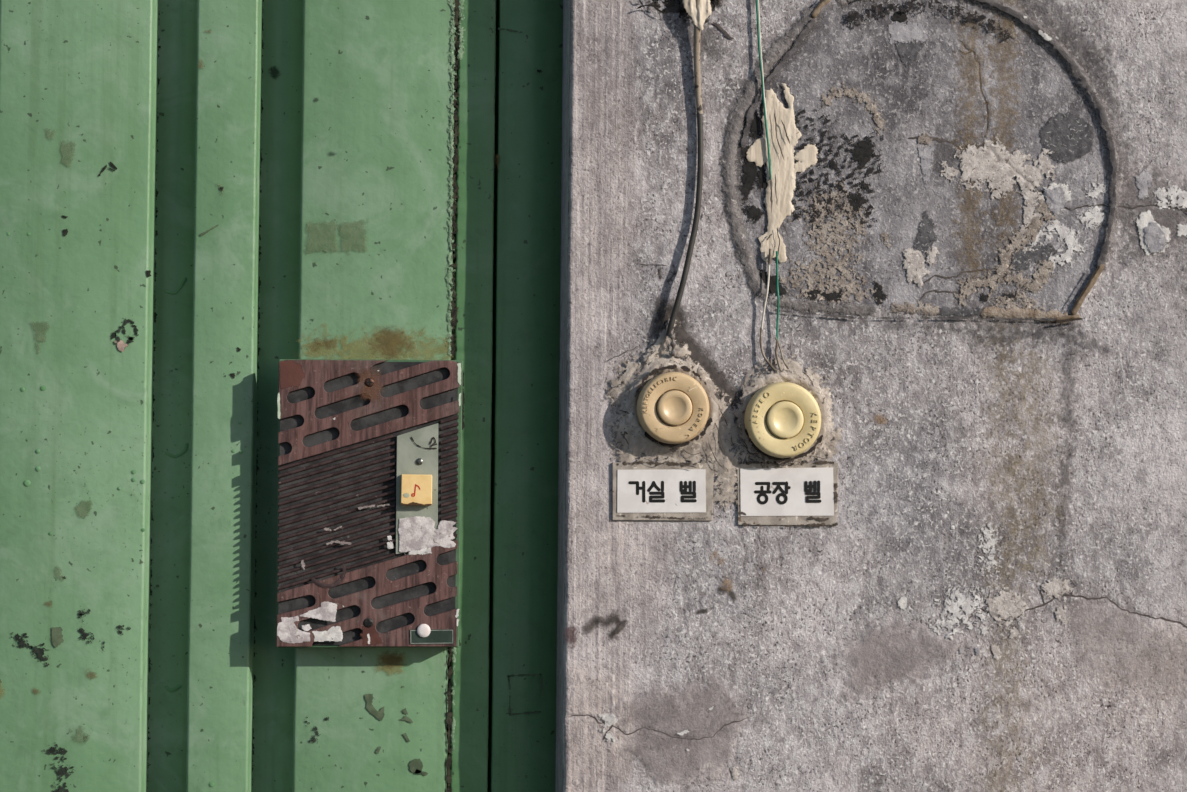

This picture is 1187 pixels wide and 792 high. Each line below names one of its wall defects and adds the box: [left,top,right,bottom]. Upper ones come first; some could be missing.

spalling [819,82,888,135]
peeling [747,135,765,167]
spalling [778,144,940,313]
peeling [939,136,1109,311]
peeling [1134,169,1187,256]
peeling [111,318,139,352]
crack [968,578,1187,628]
peeling [11,627,64,667]
peeling [78,609,105,648]
crack [570,714,754,740]
peeling [44,729,88,792]